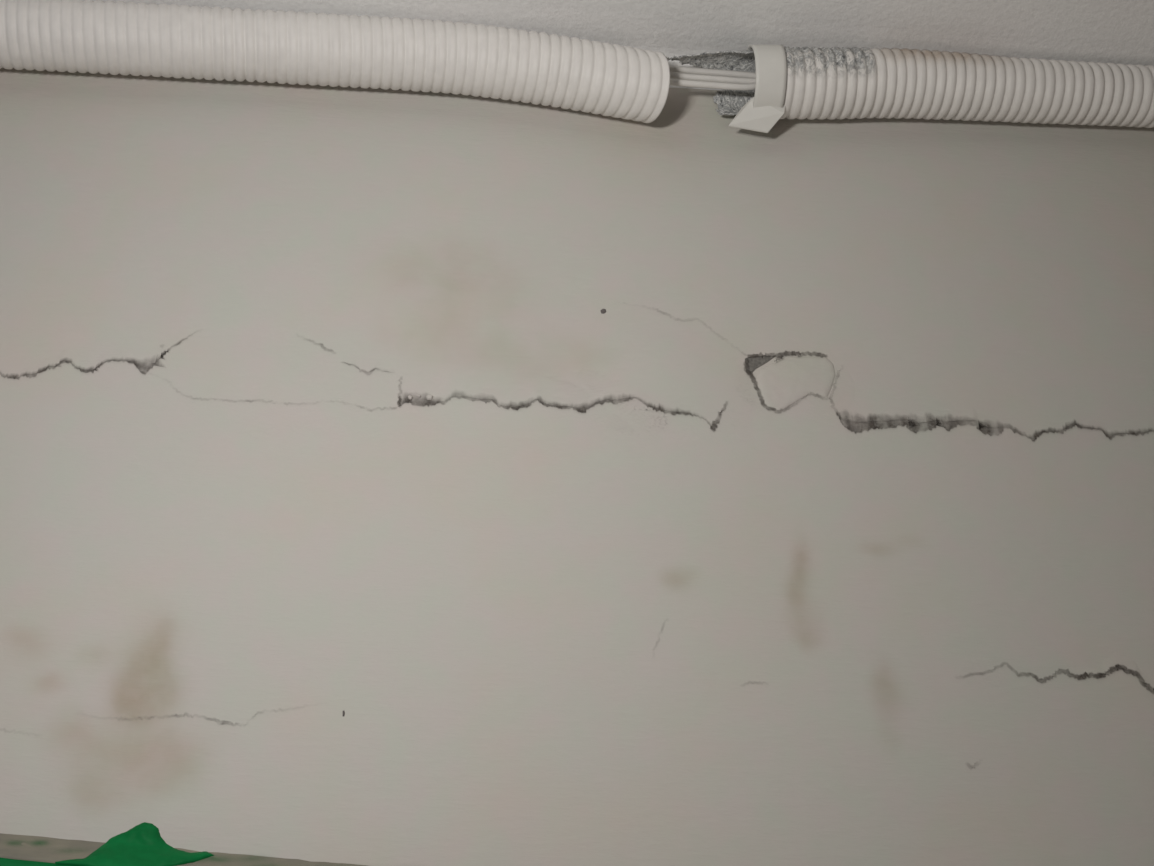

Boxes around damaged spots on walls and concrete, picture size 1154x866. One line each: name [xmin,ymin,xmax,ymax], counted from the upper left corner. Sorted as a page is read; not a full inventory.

crack [9,343,179,379]
spalling [744,351,836,412]
crack [397,385,722,431]
crack [836,406,1154,441]
crack [1034,652,1154,691]